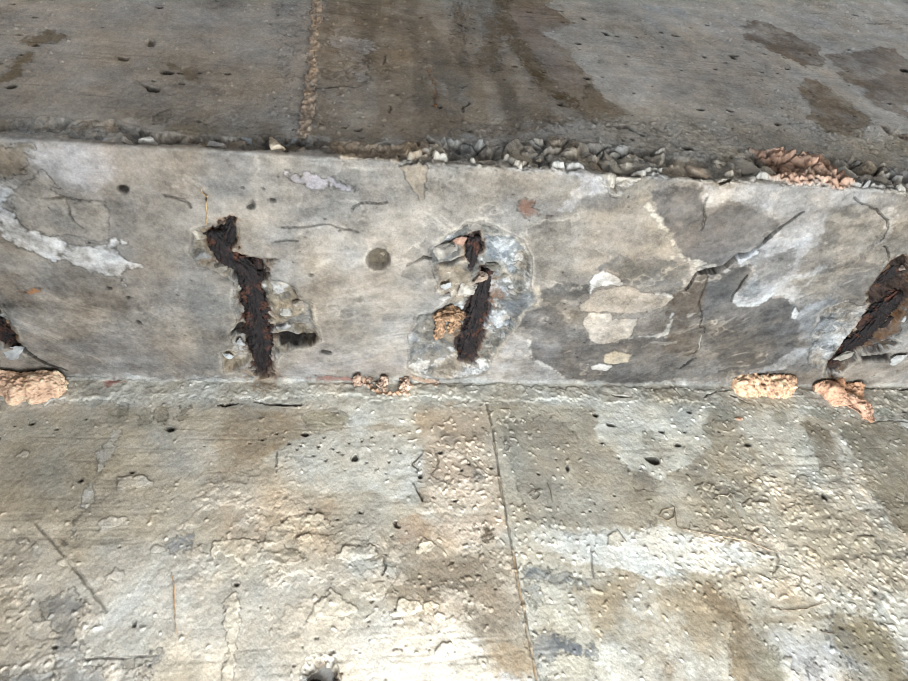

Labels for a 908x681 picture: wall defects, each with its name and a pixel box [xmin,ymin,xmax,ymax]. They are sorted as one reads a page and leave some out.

leakage [450,0,629,122]
leakage [740,19,908,119]
leakage [797,78,873,138]
crack [700,178,733,231]
spalling [0,303,24,360]
spalling [188,215,322,377]
spalling [407,220,538,380]
crack [671,213,803,404]
spalling [807,254,908,380]